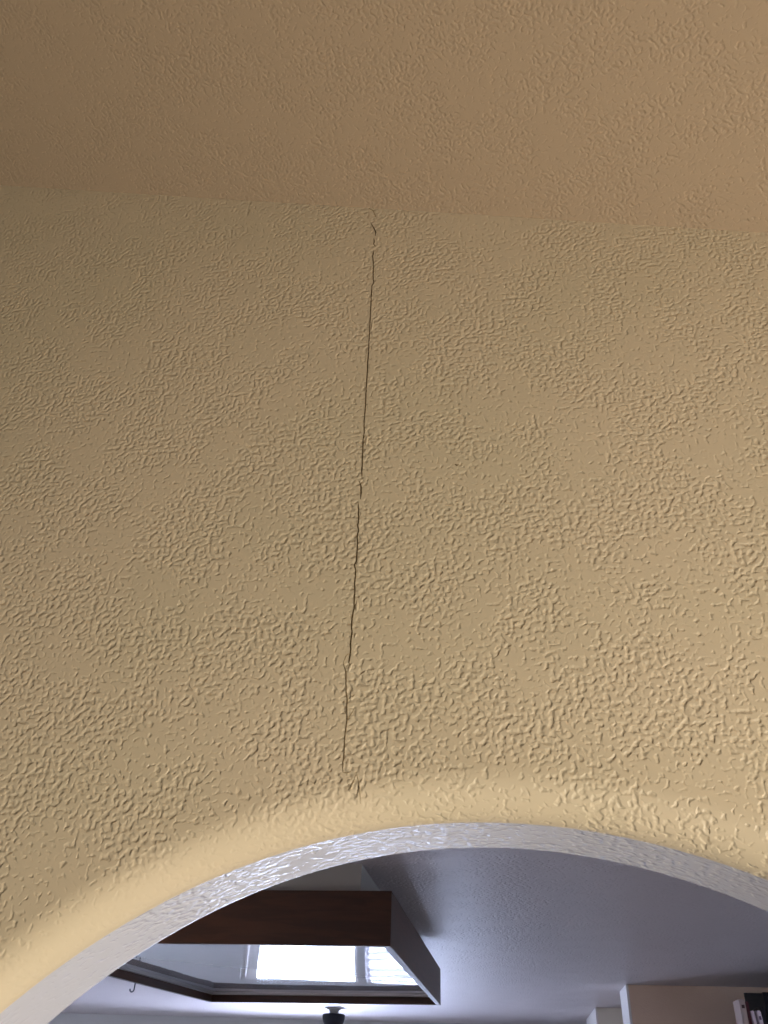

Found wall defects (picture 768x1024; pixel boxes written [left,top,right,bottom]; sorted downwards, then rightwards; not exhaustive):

crack [342,208,378,804]